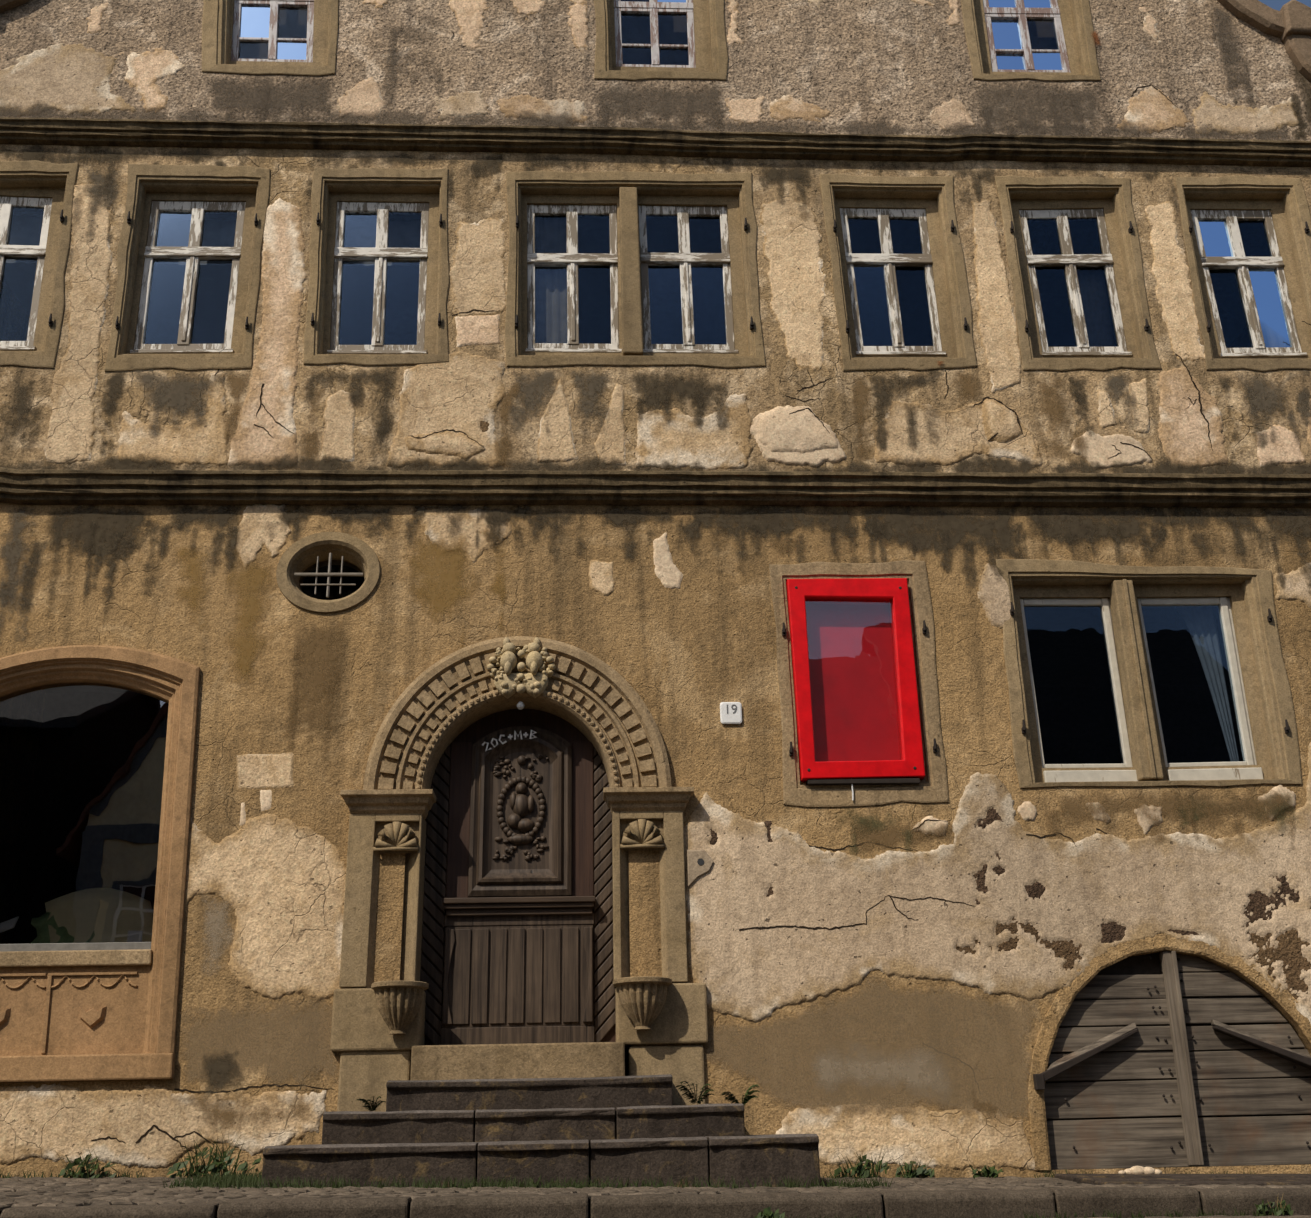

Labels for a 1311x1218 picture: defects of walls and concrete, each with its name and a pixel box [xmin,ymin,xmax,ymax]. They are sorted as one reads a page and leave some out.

water stain [103,372,247,435]
crack [254,383,294,438]
water stain [635,374,727,427]
water stain [853,371,940,458]
crack [1174,352,1213,451]
water stain [0,505,269,675]
water stain [596,505,1311,587]
peeling [1274,562,1311,609]
peeling [184,752,346,1000]
crack [739,895,973,931]
peeling [683,742,1311,1024]
peeling [776,1105,1038,1171]